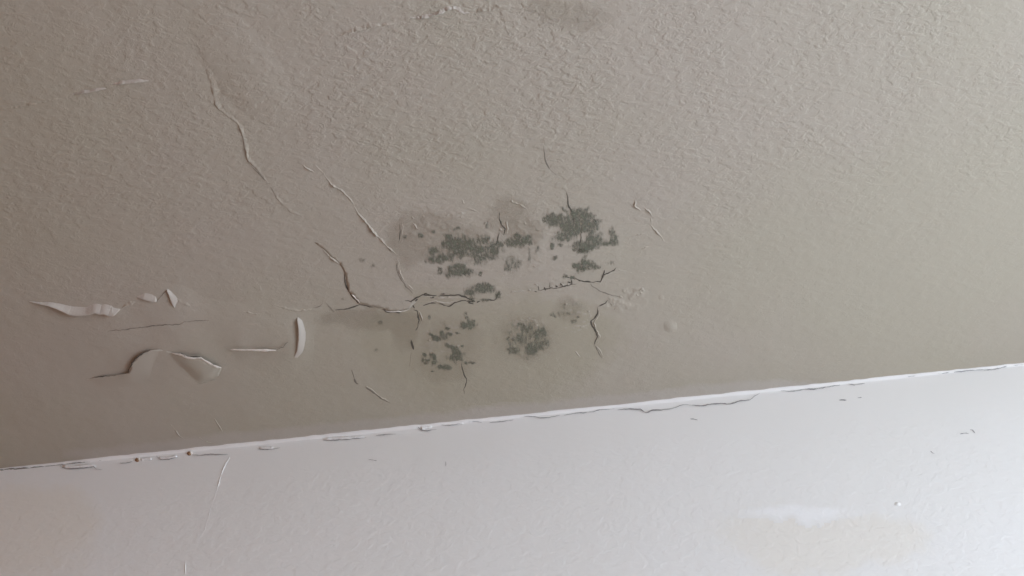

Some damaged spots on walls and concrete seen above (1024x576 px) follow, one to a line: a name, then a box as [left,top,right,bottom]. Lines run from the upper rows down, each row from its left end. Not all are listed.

crack [201,55,303,217]
crack [0,462,101,471]
crack [302,165,664,367]
water stain [350,208,634,414]
crack [418,394,758,431]
crack [938,364,1023,375]